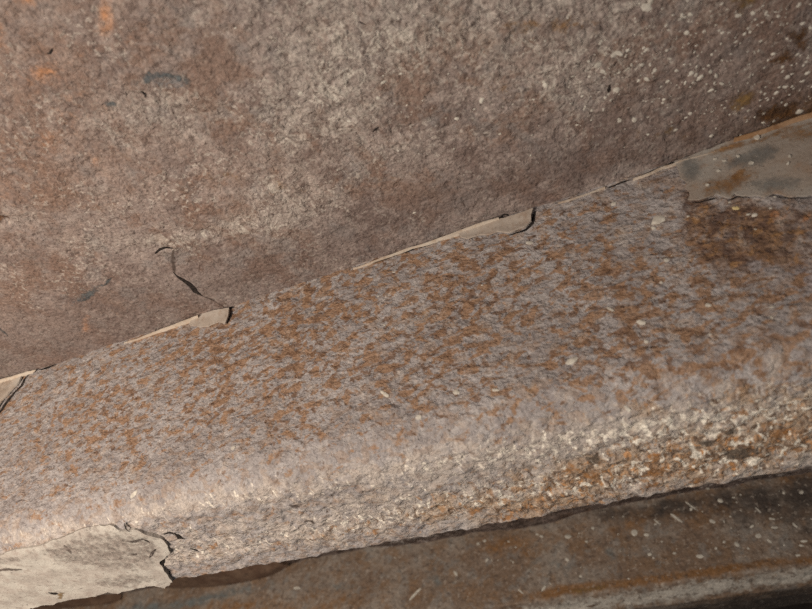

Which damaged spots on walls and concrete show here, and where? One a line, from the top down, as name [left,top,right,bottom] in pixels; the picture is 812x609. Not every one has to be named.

peeling [558,112,812,204]
peeling [353,208,536,270]
crack [155,247,225,308]
peeling [0,364,56,413]
spalling [724,448,761,459]
rust [153,561,289,588]